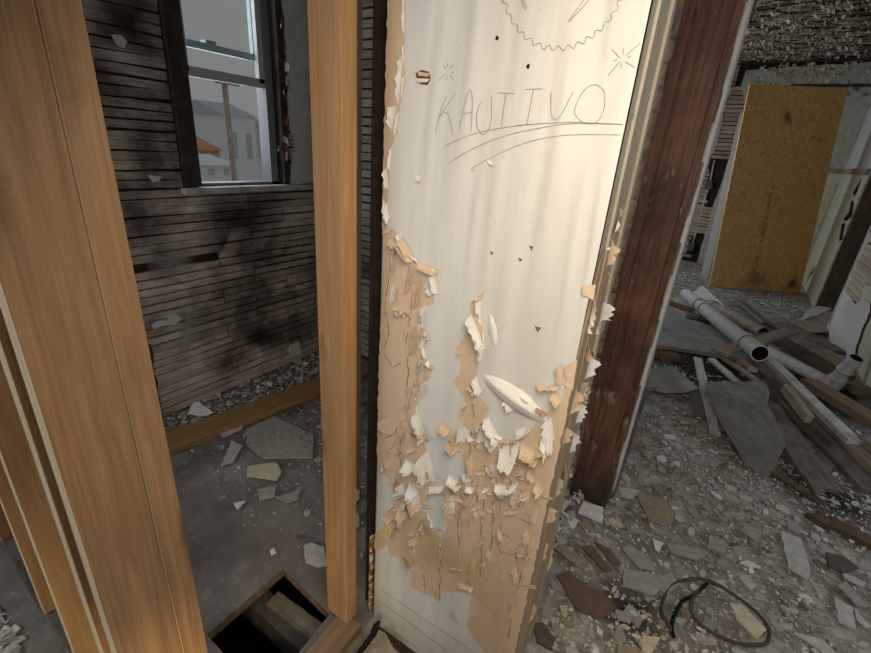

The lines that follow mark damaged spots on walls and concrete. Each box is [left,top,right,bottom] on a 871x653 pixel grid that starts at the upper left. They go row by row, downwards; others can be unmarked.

peeling [738,0,871,97]
peeling [374,0,623,653]
spalling [623,569,674,597]